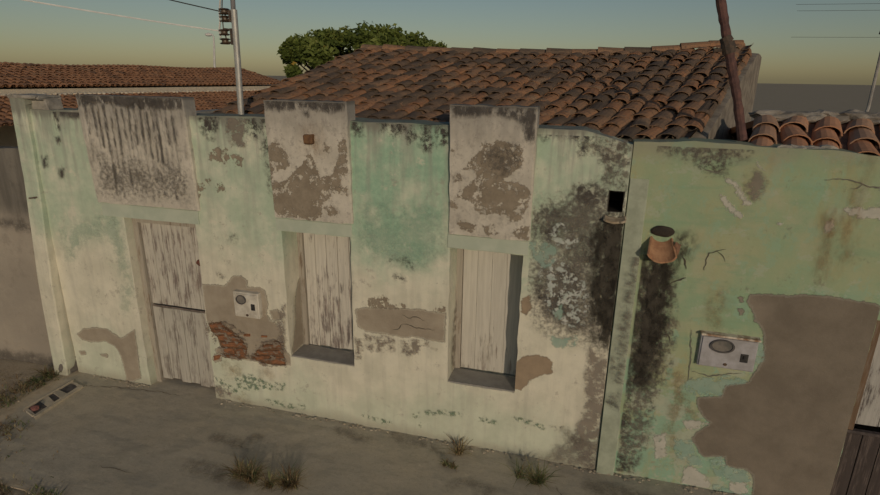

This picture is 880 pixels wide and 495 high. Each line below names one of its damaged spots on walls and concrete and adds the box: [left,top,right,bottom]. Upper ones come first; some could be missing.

water stain [53,95,182,180]
peeling [268,139,348,221]
peeling [202,275,304,368]
peeling [368,297,406,310]
water stain [450,106,688,472]
peeling [653,433,750,495]